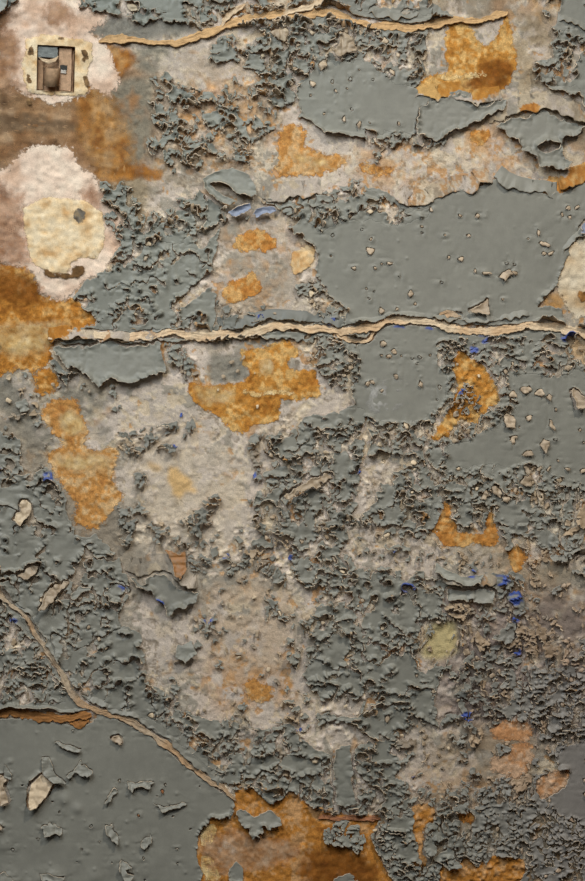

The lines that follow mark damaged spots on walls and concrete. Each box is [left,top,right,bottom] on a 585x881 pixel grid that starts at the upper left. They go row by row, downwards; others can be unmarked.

crack [98,0,509,47]
corrosion [421,16,517,91]
corrosion [273,123,347,178]
peeling [0,0,585,412]
crack [48,310,585,344]
corrosion [0,264,124,531]
corrosion [187,339,321,434]
corrosion [431,351,500,441]
corrosion [431,501,499,547]
peeling [0,335,585,881]
crack [0,586,236,801]
corrosion [196,787,392,881]